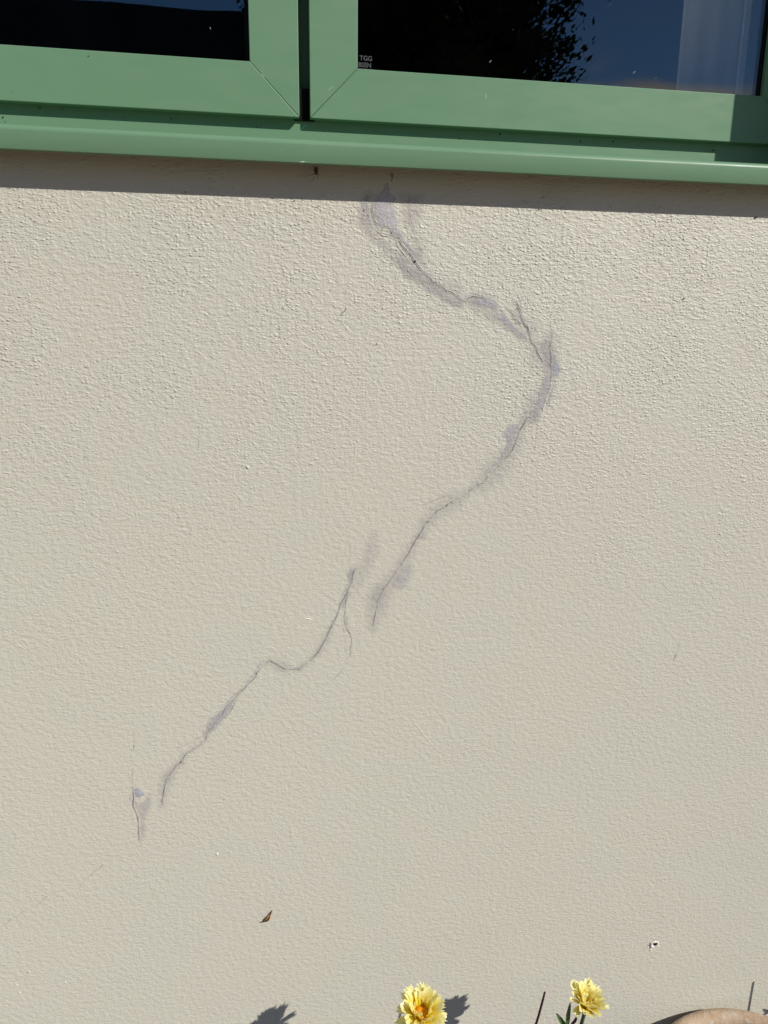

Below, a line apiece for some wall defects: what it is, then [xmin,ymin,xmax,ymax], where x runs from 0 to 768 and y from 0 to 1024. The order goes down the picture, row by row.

crack [162,203,553,805]